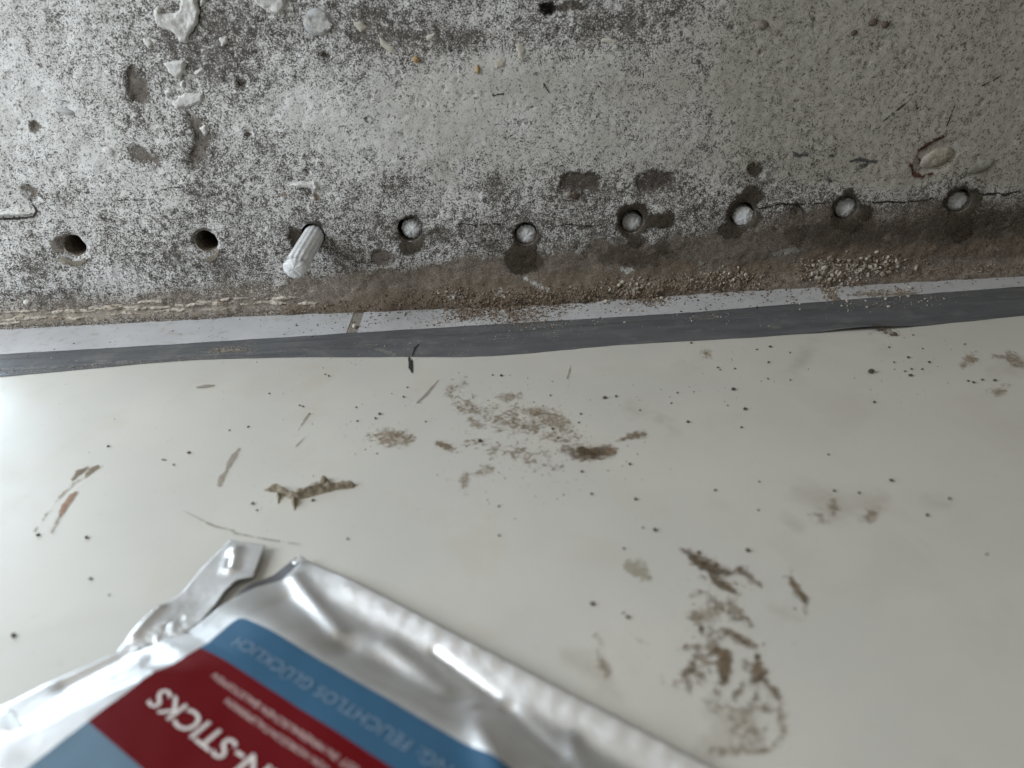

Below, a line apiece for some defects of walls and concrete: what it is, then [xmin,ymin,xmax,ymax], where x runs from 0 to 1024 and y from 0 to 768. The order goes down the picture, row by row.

leakage [718,185,764,239]
crack [758,202,825,215]
leakage [734,185,1024,275]
crack [859,197,935,205]
crack [981,190,1020,198]
leakage [284,203,705,313]